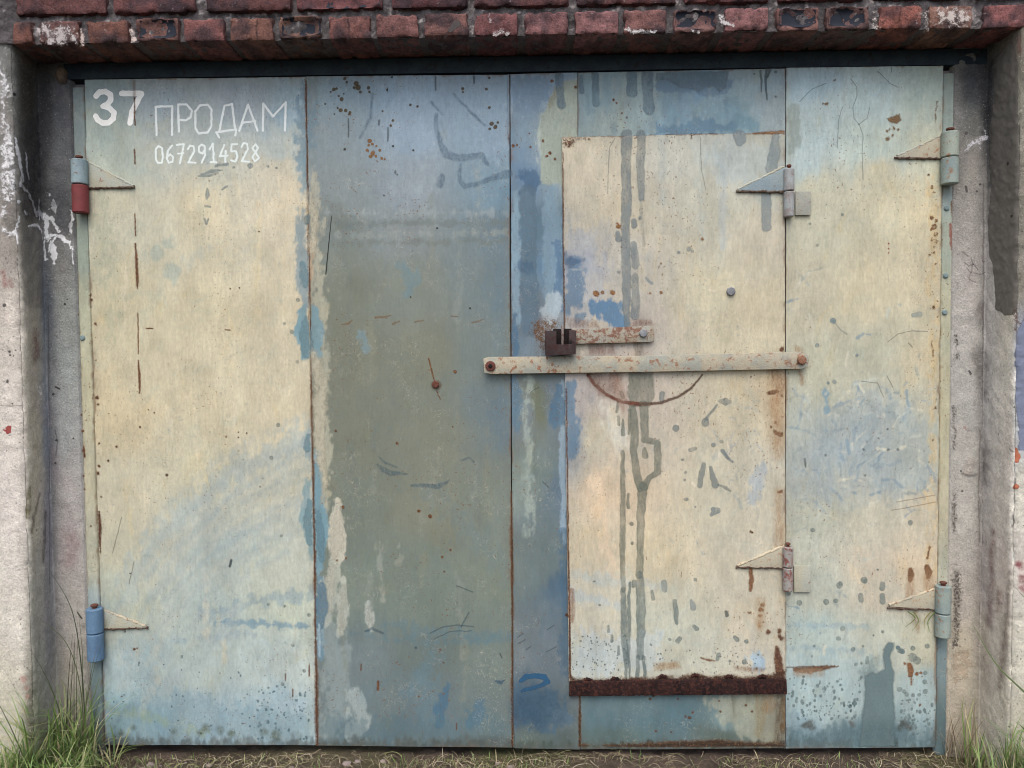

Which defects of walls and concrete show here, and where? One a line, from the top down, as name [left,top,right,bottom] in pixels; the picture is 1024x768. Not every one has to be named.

peeling [0,61,18,236]
rust [324,77,371,115]
rust [885,114,901,141]
peeling [300,194,318,288]
peeling [299,316,346,657]
rust [565,386,838,681]
rust [908,546,932,591]